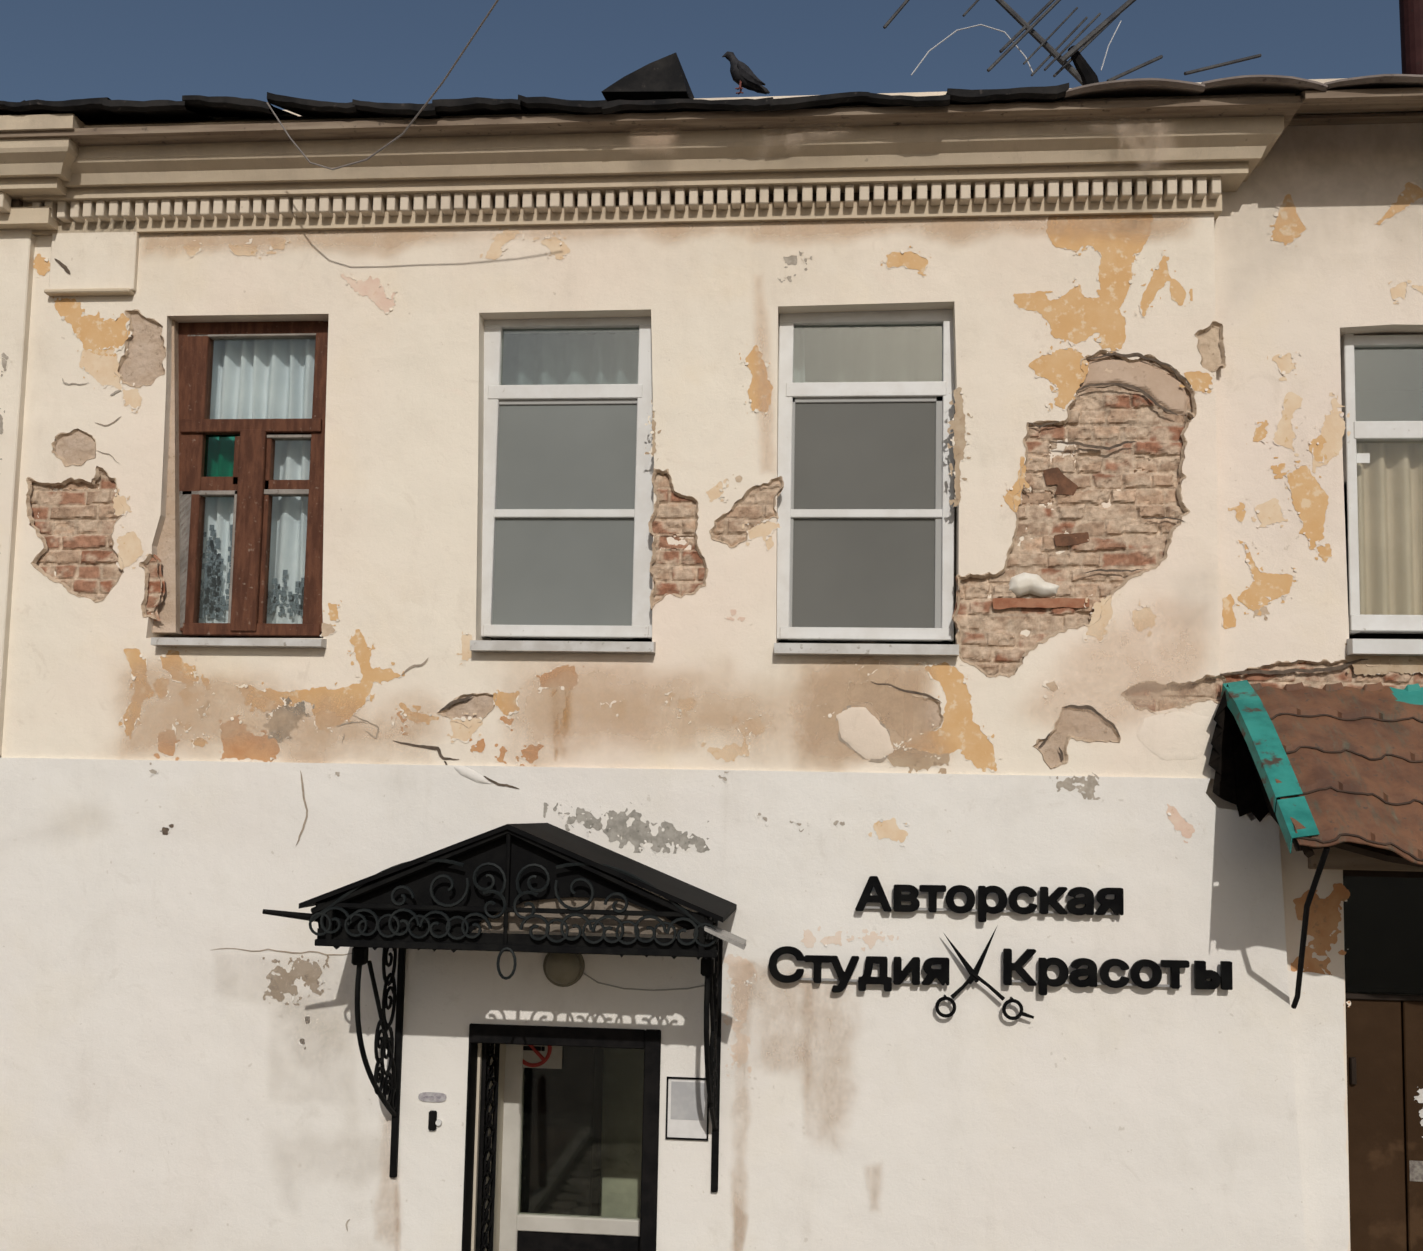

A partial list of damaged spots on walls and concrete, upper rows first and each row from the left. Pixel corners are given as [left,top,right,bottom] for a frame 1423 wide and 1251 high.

flaking render [53,296,166,413]
flaking render [26,429,165,621]
flaking render [644,400,784,610]
flaking render [846,214,1226,775]
peeling [1222,351,1351,629]
peeling [118,600,405,777]
crack [338,695,519,789]
flaking render [391,657,584,766]
flaking render [1032,680,1121,800]
flaking render [1121,643,1423,714]
peeling [543,802,710,854]
peeling [262,955,334,1049]